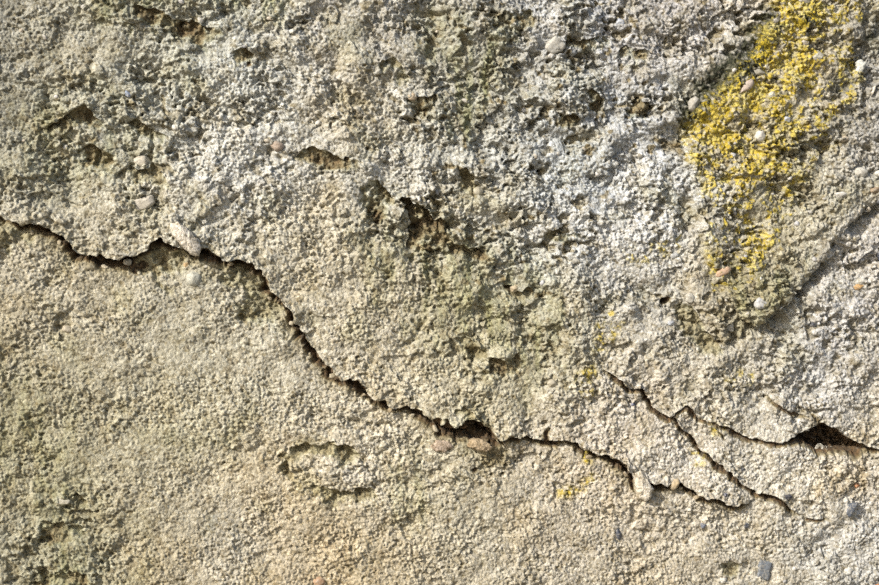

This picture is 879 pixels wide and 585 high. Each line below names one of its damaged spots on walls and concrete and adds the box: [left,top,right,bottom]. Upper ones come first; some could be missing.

crack [0,204,835,524]
crack [859,441,879,456]